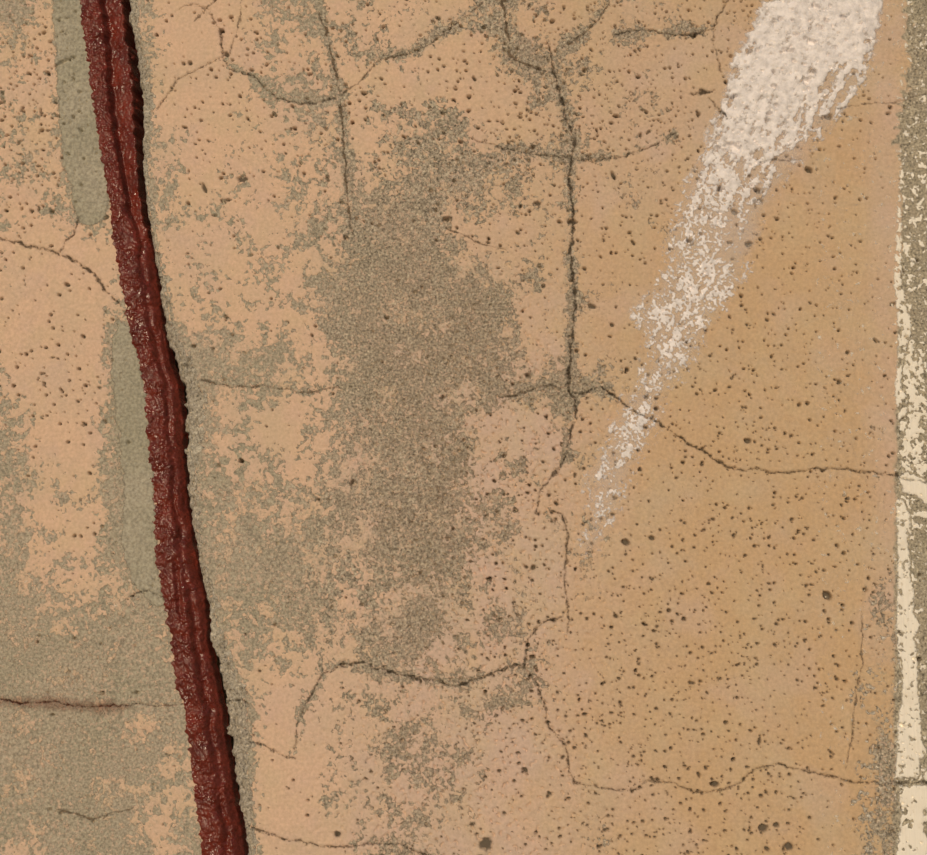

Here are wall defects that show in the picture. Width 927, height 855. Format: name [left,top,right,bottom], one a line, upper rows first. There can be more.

peeling [136,0,170,94]
crack [1,0,482,855]
peeling [147,0,713,855]
crack [296,0,925,731]
crack [536,682,696,793]
damp [578,0,883,546]
crack [769,623,868,783]
peeling [842,114,927,855]
peeling [896,1,927,108]